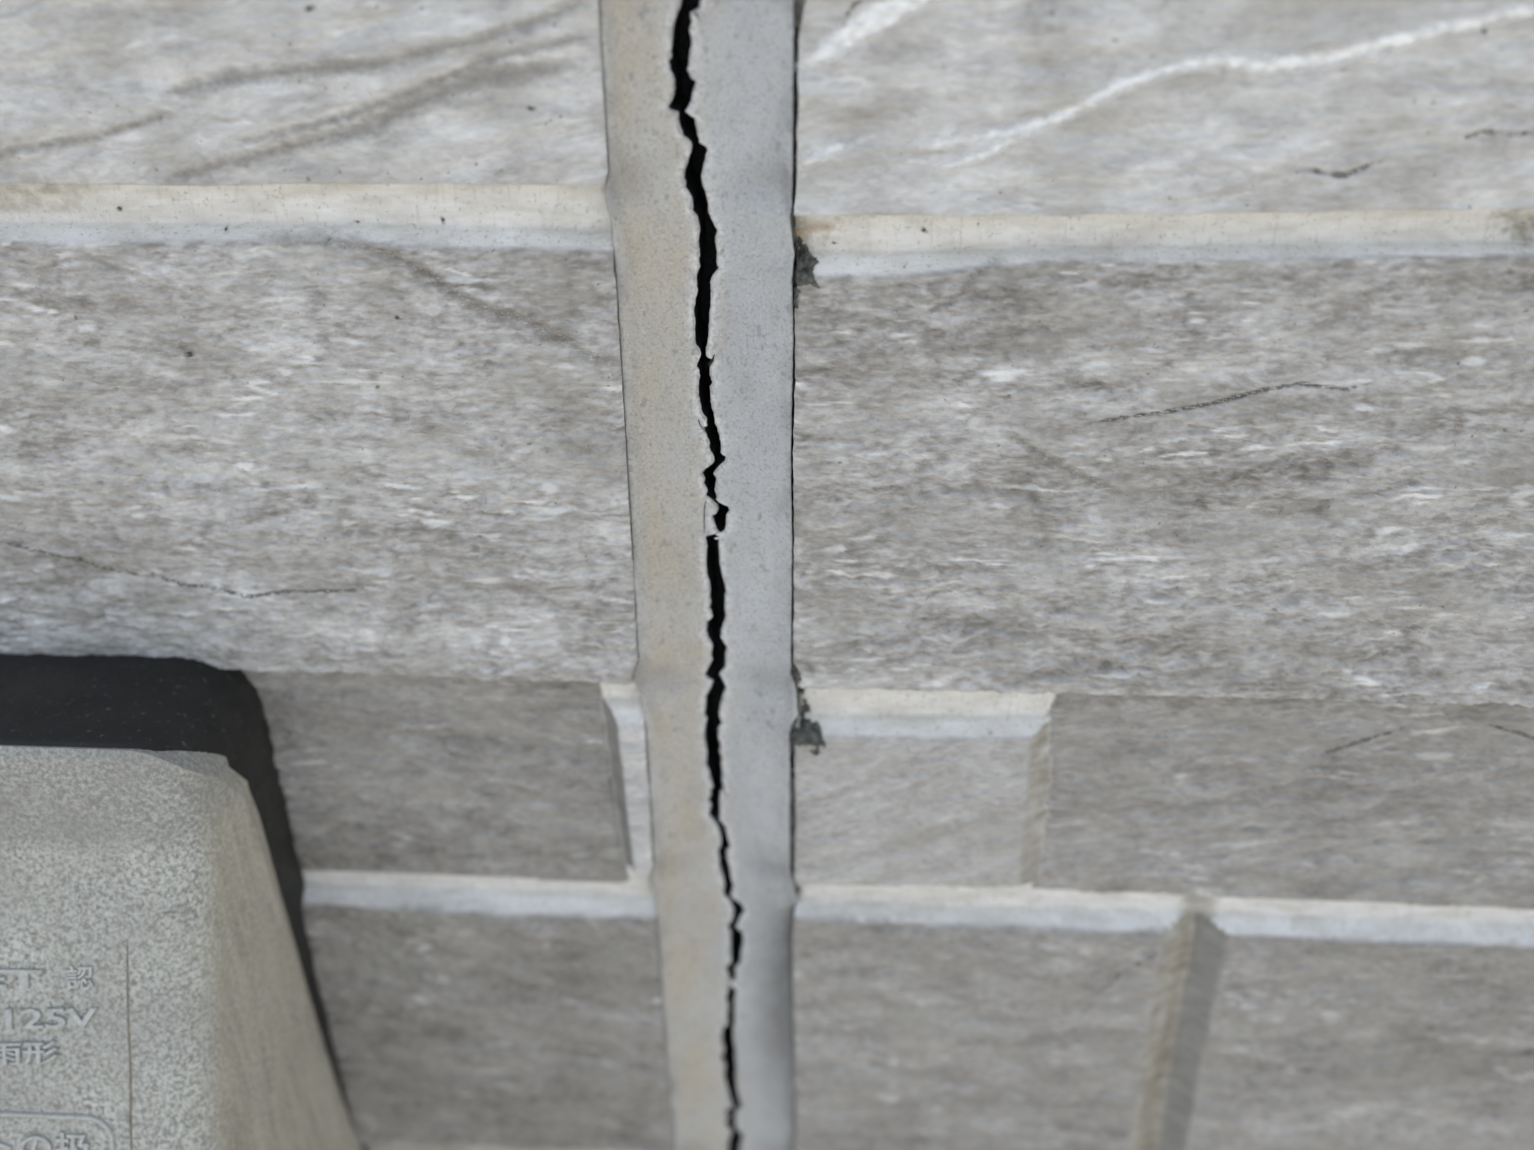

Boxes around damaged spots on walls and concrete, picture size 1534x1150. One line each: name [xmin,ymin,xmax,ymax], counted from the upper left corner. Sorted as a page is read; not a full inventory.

crack [669,0,744,1150]